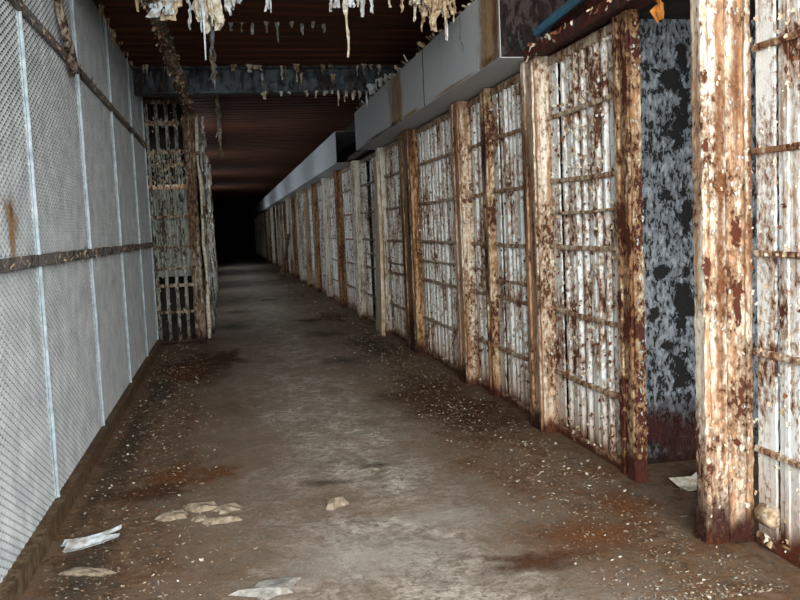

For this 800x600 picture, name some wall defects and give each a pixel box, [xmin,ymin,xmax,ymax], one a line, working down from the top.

peeling [264,0,280,43]
peeling [231,64,268,100]
peeling [78,0,254,294]
corrosion [731,23,752,285]
corrosion [5,201,18,256]
corrosion [402,178,412,290]
corrosion [523,132,535,272]
corrosion [715,82,724,308]
corrosion [406,307,416,349]
corrosion [647,406,697,461]
corrosion [694,497,756,544]